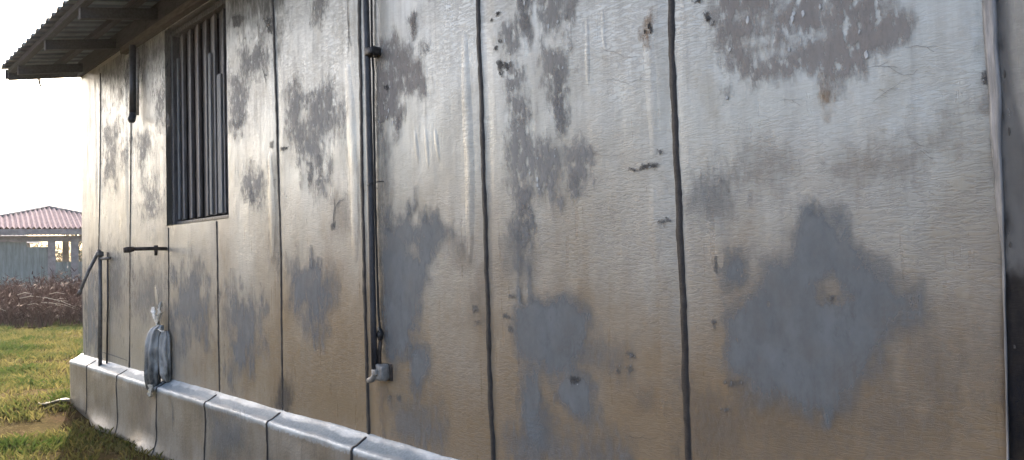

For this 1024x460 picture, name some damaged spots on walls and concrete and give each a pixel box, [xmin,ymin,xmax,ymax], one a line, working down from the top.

peeling [691,0,913,84]
leakage [170,262,211,352]
leakage [291,248,336,347]
leakage [381,191,447,393]
leakage [513,254,593,460]
leakage [725,204,922,424]